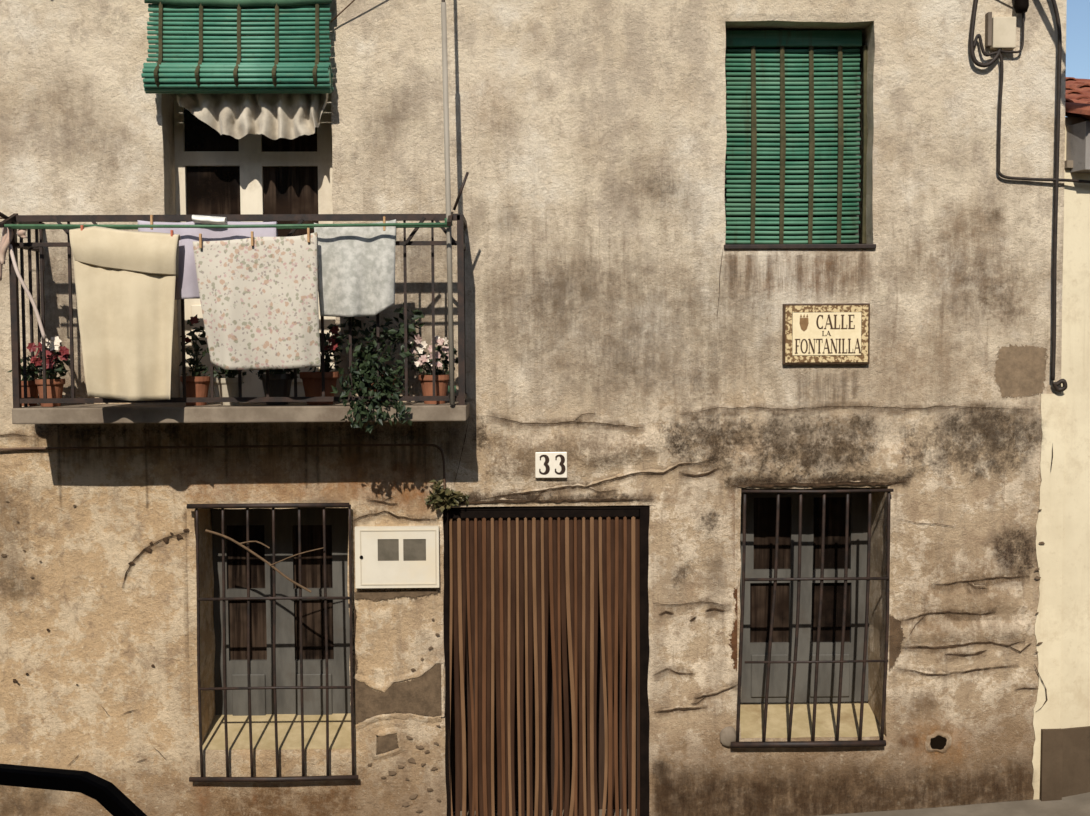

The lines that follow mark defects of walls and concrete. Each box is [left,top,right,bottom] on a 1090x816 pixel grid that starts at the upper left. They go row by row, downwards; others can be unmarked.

flaking render [994,344,1048,398]
crack [351,410,906,521]
water stain [667,414,874,485]
water stain [904,413,1037,476]
crack [122,529,189,588]
water stain [996,531,1036,573]
crack [653,600,732,621]
crack [896,574,1048,712]
flaking render [350,588,444,780]
crack [653,666,738,713]